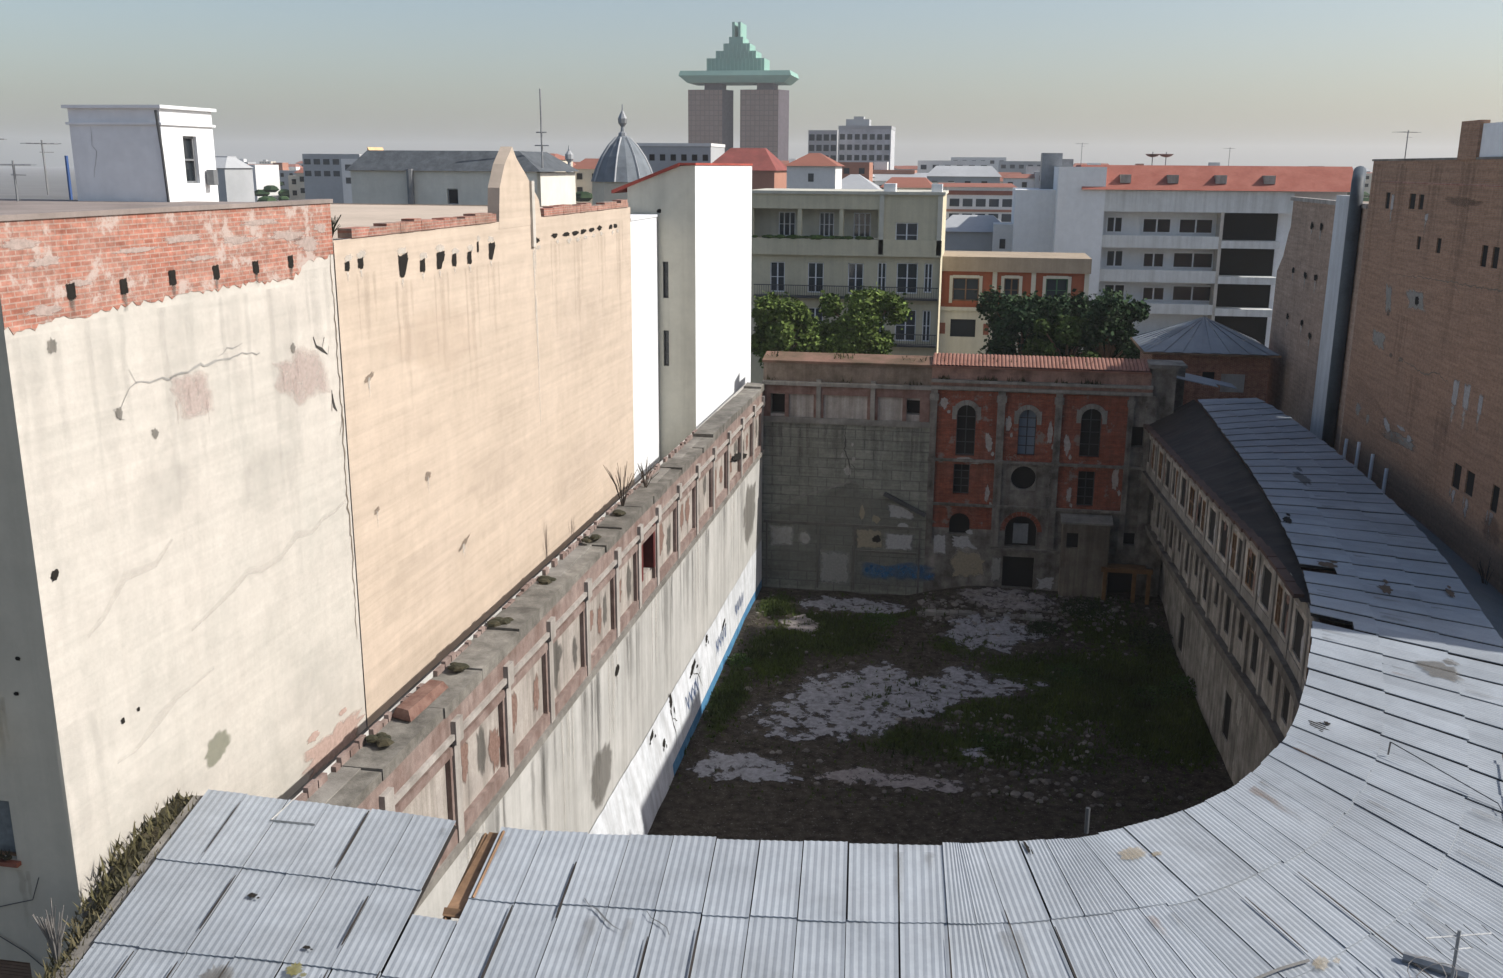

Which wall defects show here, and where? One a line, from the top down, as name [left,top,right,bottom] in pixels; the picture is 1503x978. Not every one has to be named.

spalling [0,203,364,335]
crack [114,343,260,420]
flaking render [820,504,914,583]
spalling [933,529,1001,581]
flaking render [303,707,364,779]